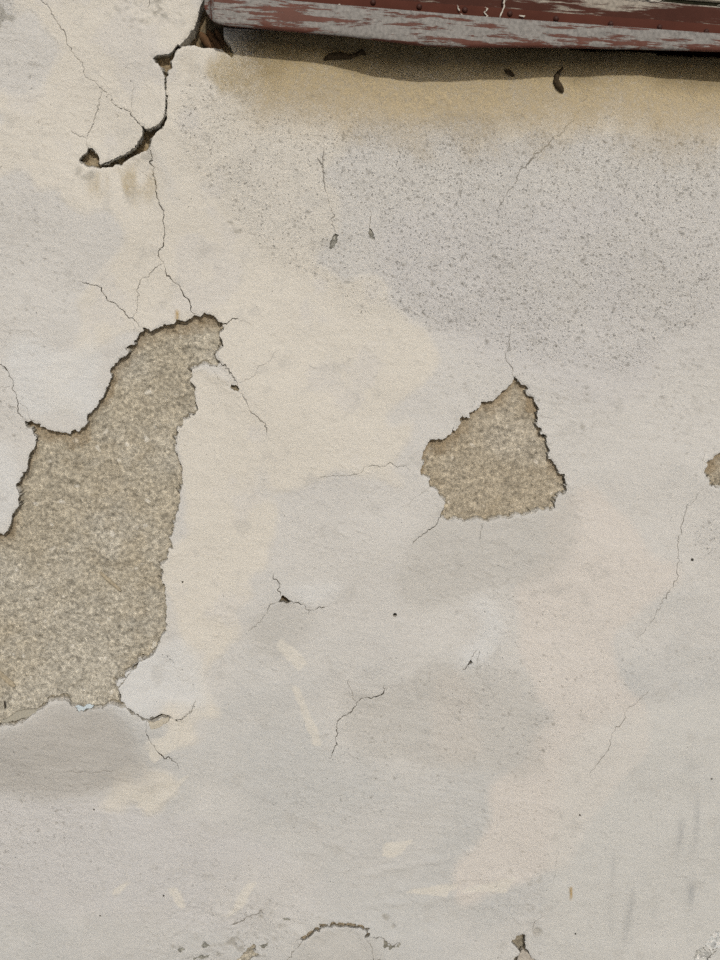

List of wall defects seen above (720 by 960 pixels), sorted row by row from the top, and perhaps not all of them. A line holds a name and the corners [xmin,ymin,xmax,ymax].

crack [41,0,141,145]
crack [79,148,192,327]
crack [0,364,35,422]
spalling [0,313,239,729]
crack [221,350,277,438]
spalling [420,377,568,522]
spalling [704,453,720,488]
crack [251,578,325,629]